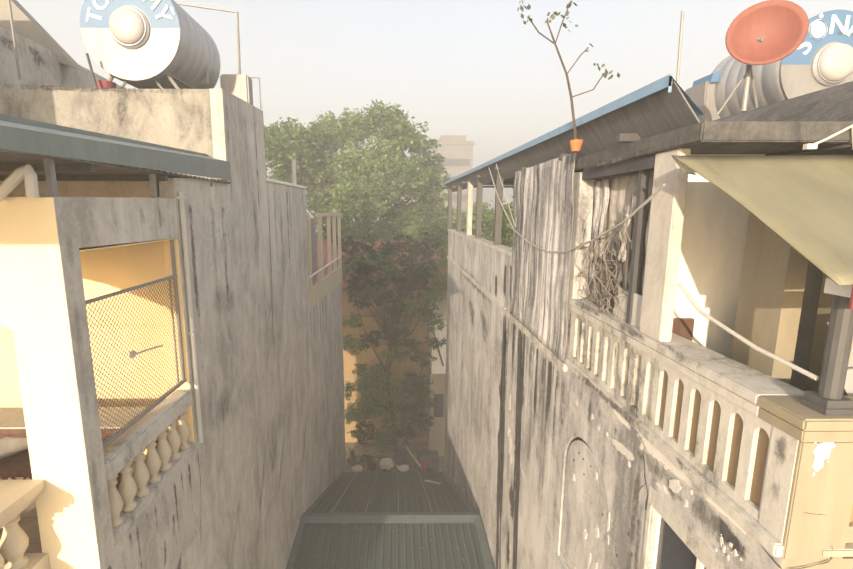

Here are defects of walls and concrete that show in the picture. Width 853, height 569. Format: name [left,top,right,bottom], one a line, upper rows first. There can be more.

damp [487,318,574,569]
damp [579,377,692,498]
peeling [811,442,835,476]
damp [627,476,640,569]
damp [699,492,748,556]
spalling [715,534,742,561]